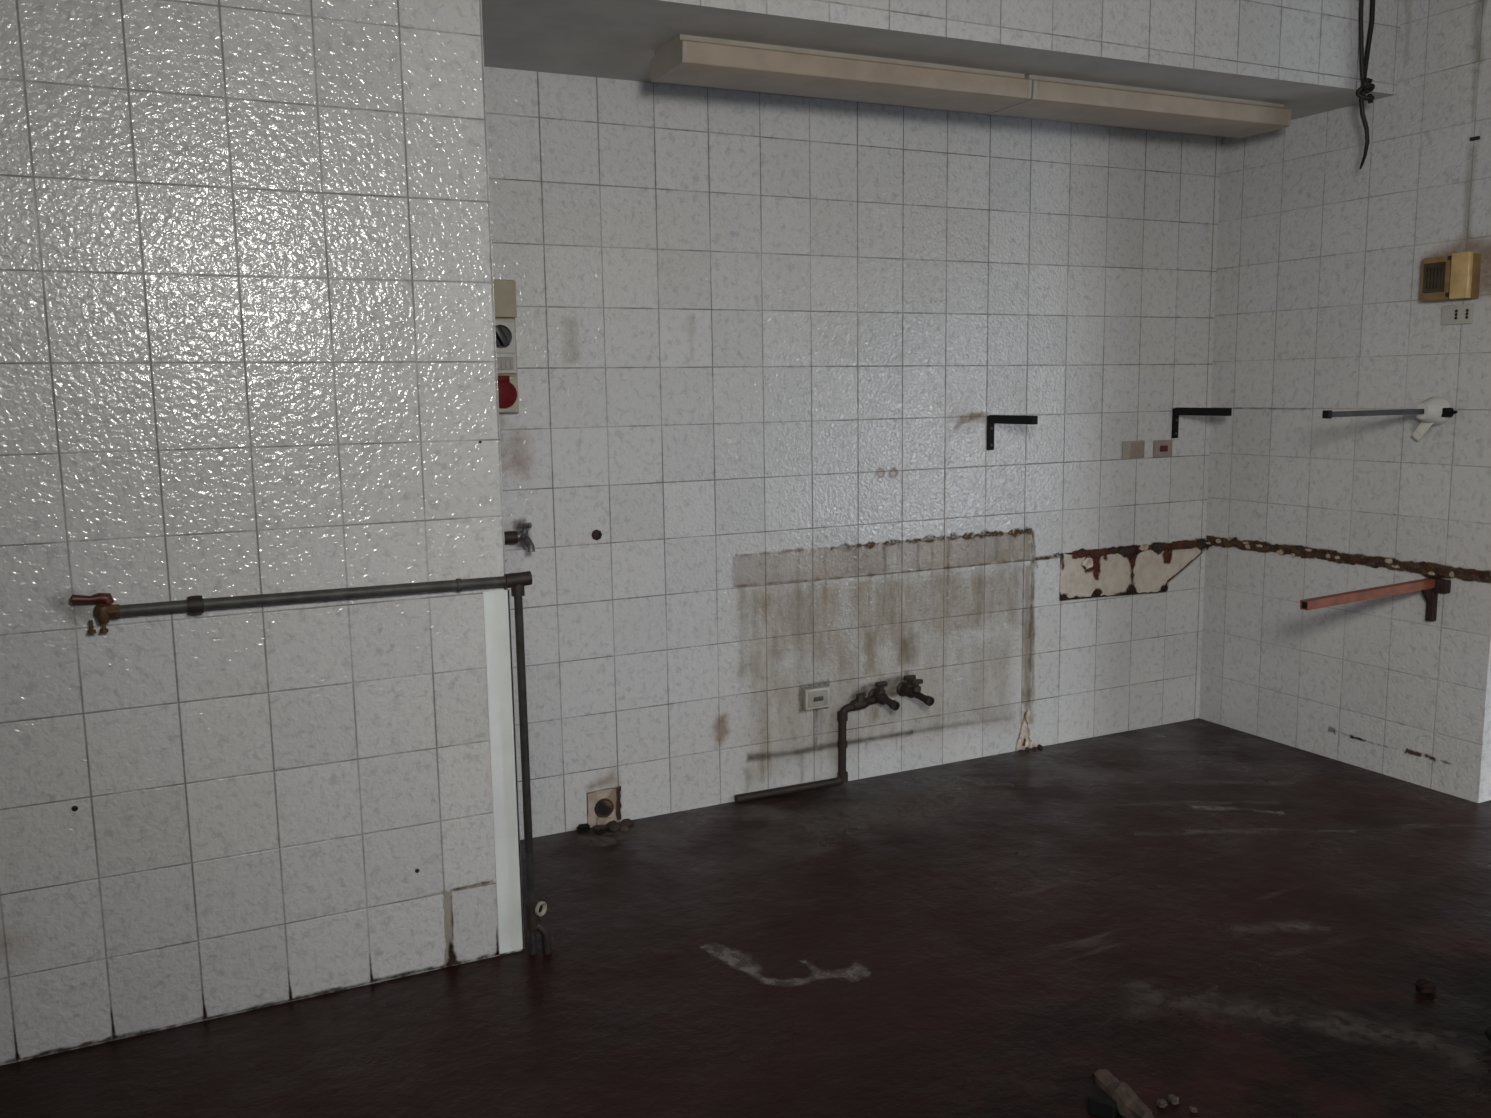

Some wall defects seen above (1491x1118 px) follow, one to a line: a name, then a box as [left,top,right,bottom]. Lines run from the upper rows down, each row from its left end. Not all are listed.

spalling [1059,547,1201,601]